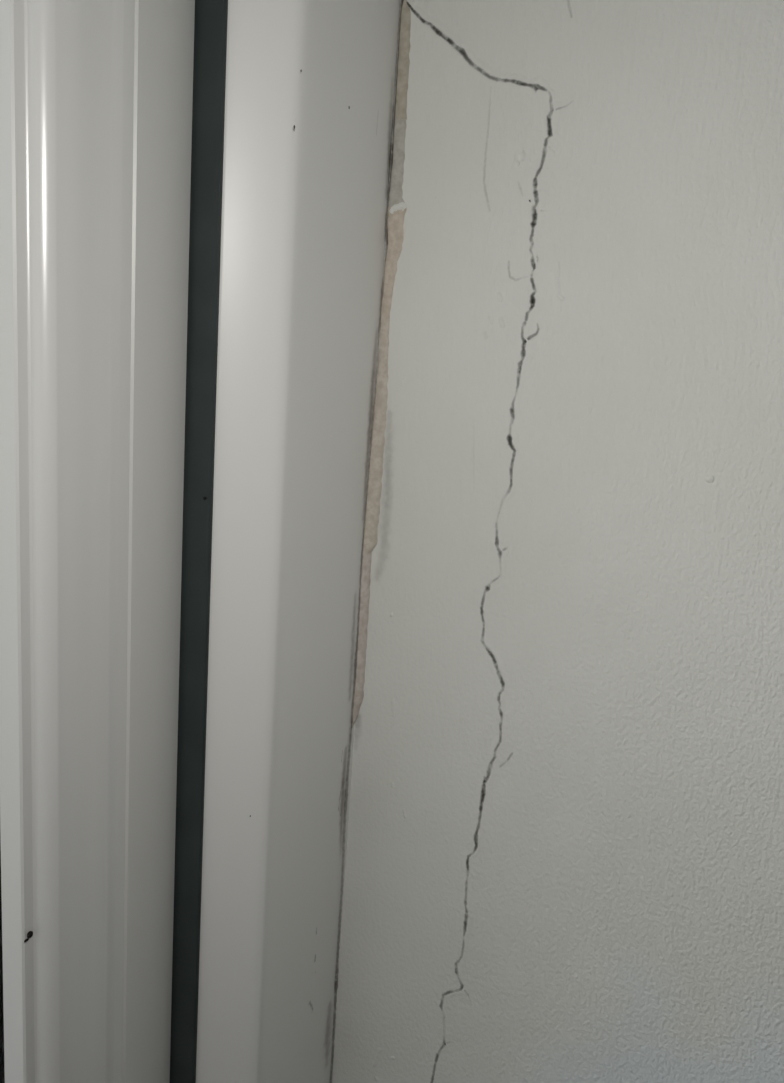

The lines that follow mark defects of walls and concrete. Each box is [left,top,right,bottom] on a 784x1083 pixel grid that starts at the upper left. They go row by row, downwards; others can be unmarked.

crack [388,108,396,178]
crack [401,0,562,1083]
crack [330,926,340,1081]